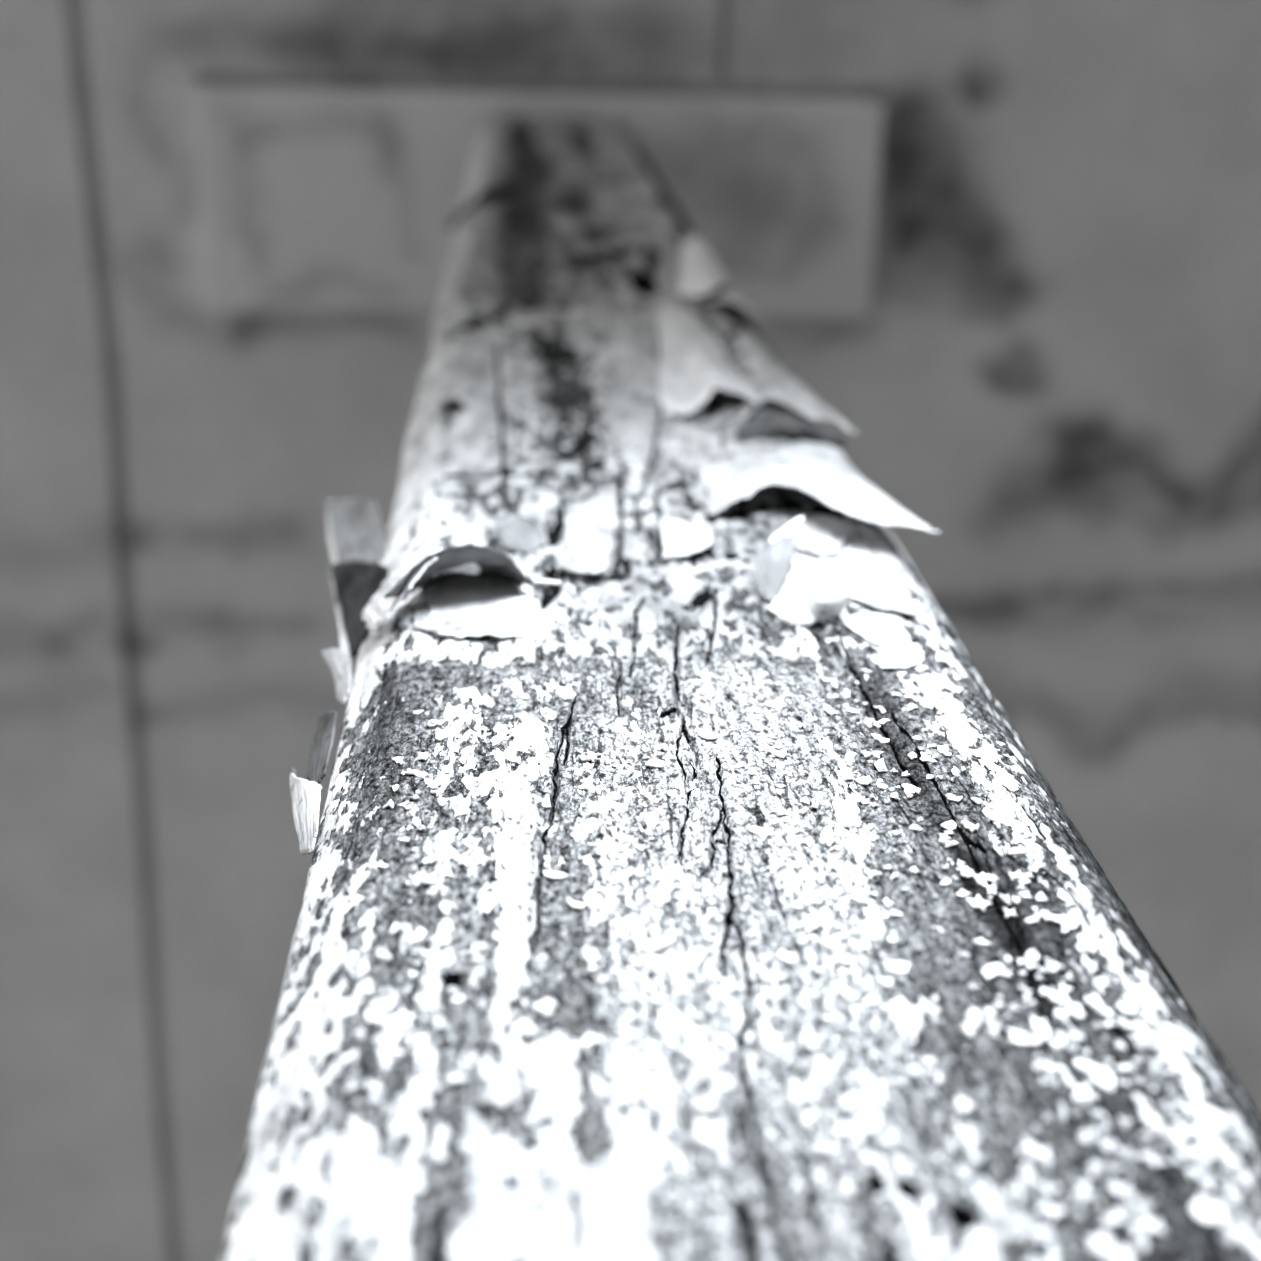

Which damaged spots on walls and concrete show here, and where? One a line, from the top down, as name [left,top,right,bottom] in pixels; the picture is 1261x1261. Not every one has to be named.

crack [567,245,660,294]
water stain [881,98,1024,296]
peeling [289,491,618,855]
peeling [657,236,1078,943]
peeling [383,752,454,887]
peeling [390,922,488,979]
peeling [532,998,558,1016]
crack [437,292,985,1261]
crack [833,621,1049,1025]
crack [1020,805,1091,927]
peeling [962,948,1250,1261]
crack [1097,994,1134,1059]